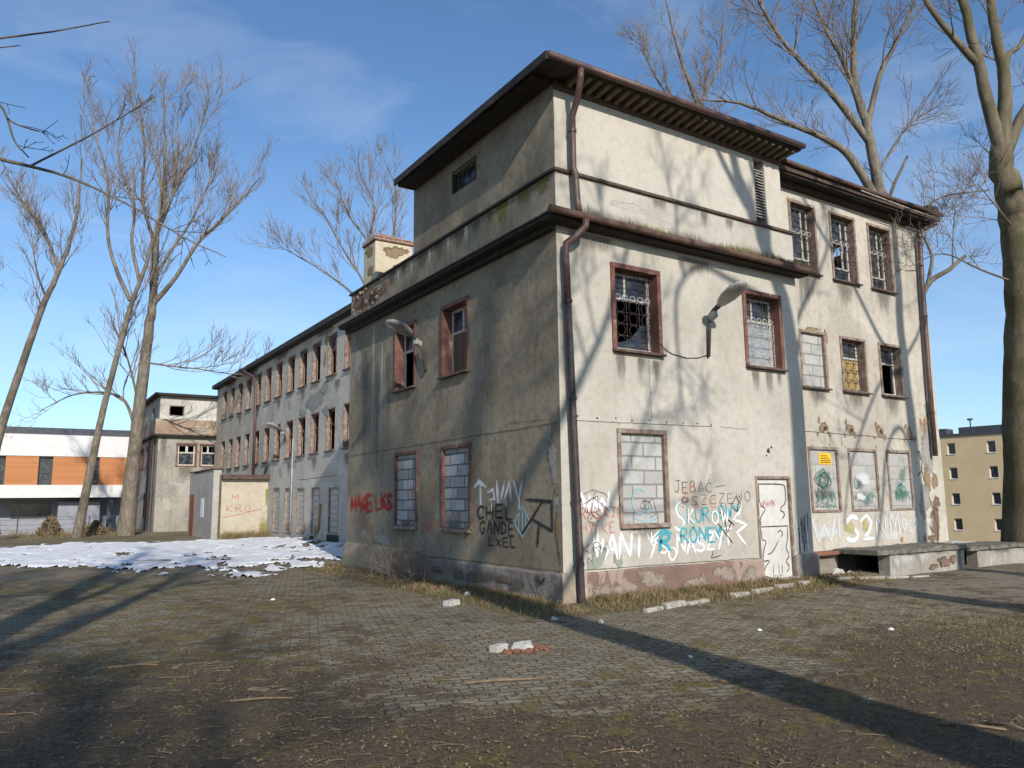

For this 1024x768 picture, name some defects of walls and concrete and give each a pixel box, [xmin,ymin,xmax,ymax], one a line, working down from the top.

spalling [352,246,409,316]
spalling [817,417,831,437]
flaking render [904,403,941,543]
spalling [930,555,956,570]
spalling [636,568,668,587]
spalling [683,565,758,588]
spalling [589,583,624,598]